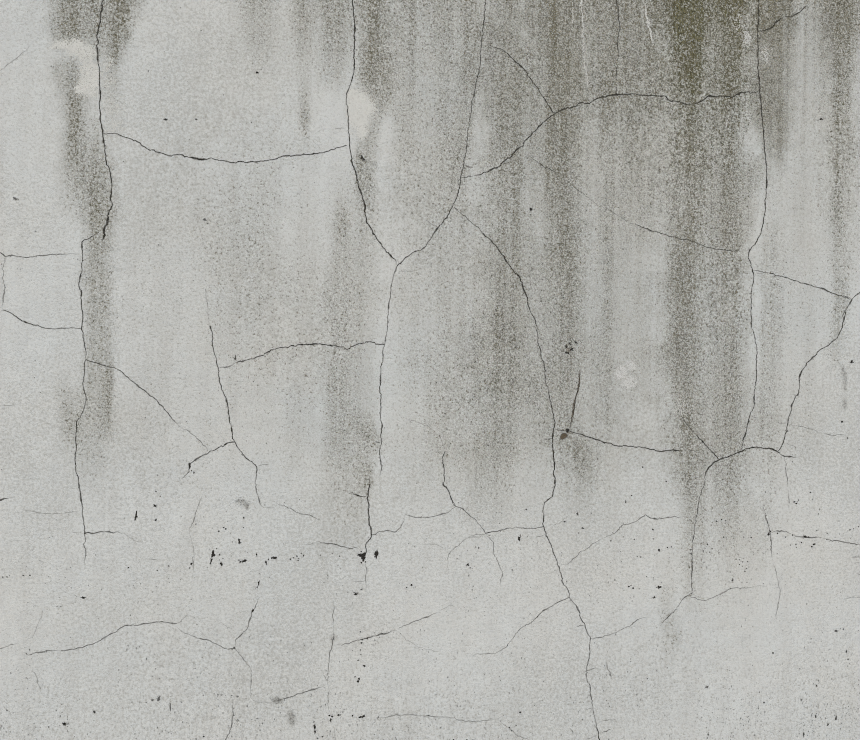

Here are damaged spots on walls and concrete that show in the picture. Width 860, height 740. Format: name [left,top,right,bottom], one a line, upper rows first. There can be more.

leakage [62,63,112,442]
leakage [51,0,131,73]
crack [4,0,860,555]
crack [465,216,679,740]
leakage [323,0,860,497]